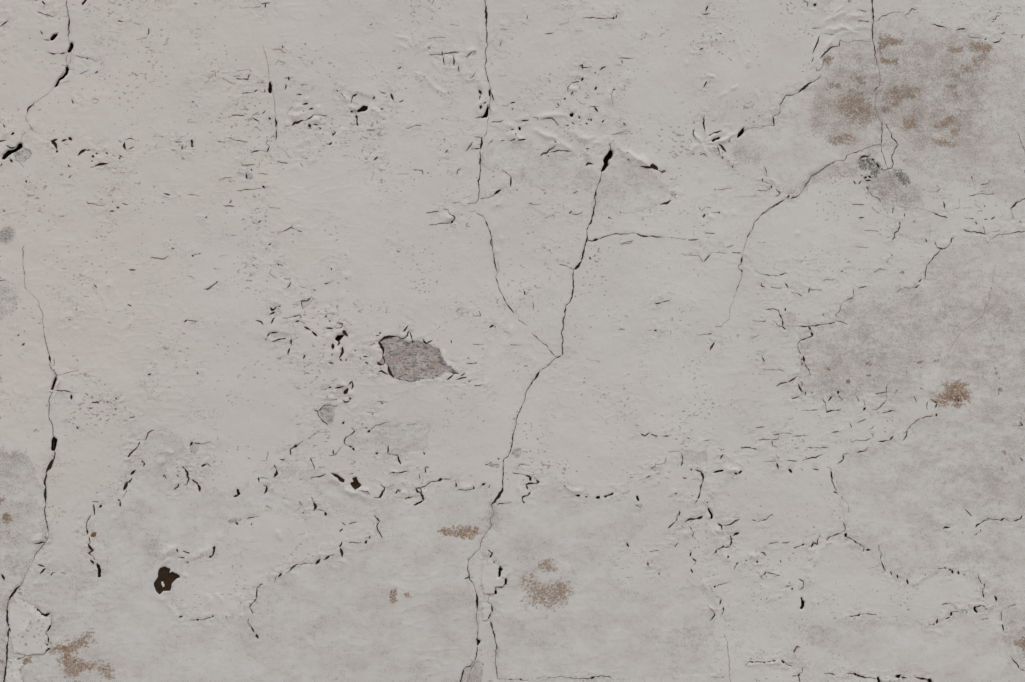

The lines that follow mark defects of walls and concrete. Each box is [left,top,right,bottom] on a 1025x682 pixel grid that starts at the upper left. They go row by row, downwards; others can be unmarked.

crack [25,1,73,133]
crack [263,46,291,158]
rust [830,76,918,145]
rust [878,35,903,64]
peeling [256,263,480,386]
crack [456,0,906,682]
rust [920,381,970,408]
crack [1,308,78,682]
peeling [0,379,739,682]
rust [438,525,479,540]
rust [521,560,574,608]
rust [50,631,113,678]